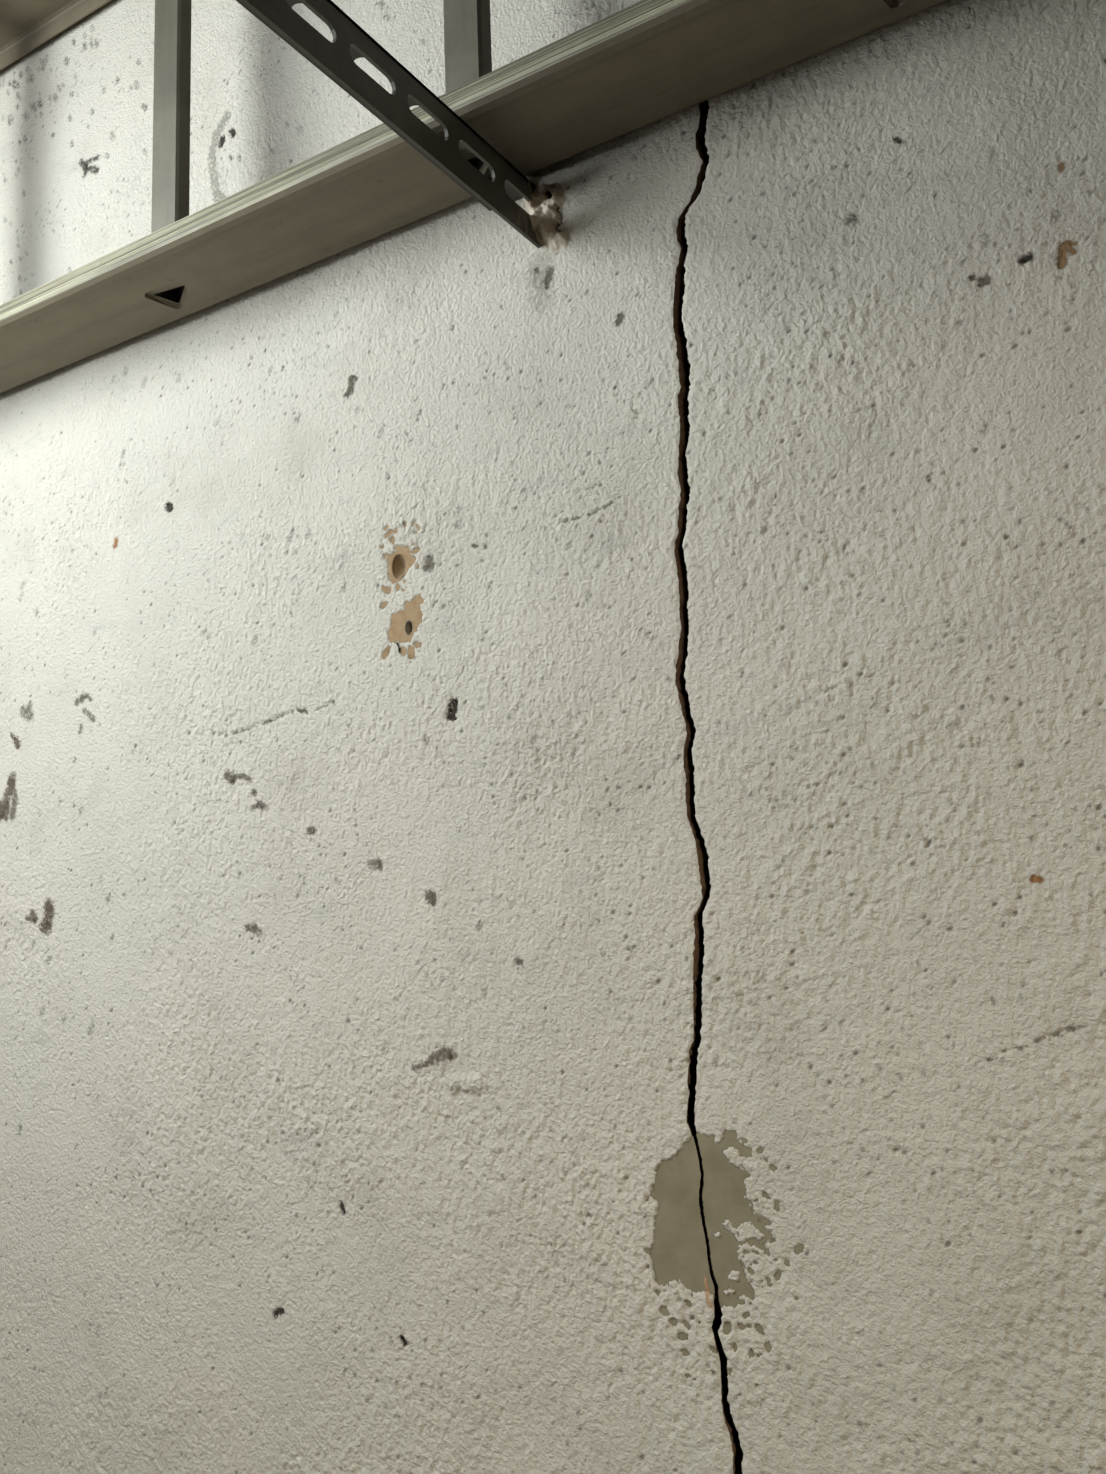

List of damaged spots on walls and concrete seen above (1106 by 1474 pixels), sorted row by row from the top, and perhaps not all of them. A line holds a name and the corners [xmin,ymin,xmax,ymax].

peeling [380,522,434,659]
crack [633,100,744,1474]
peeling [644,1130,804,1359]